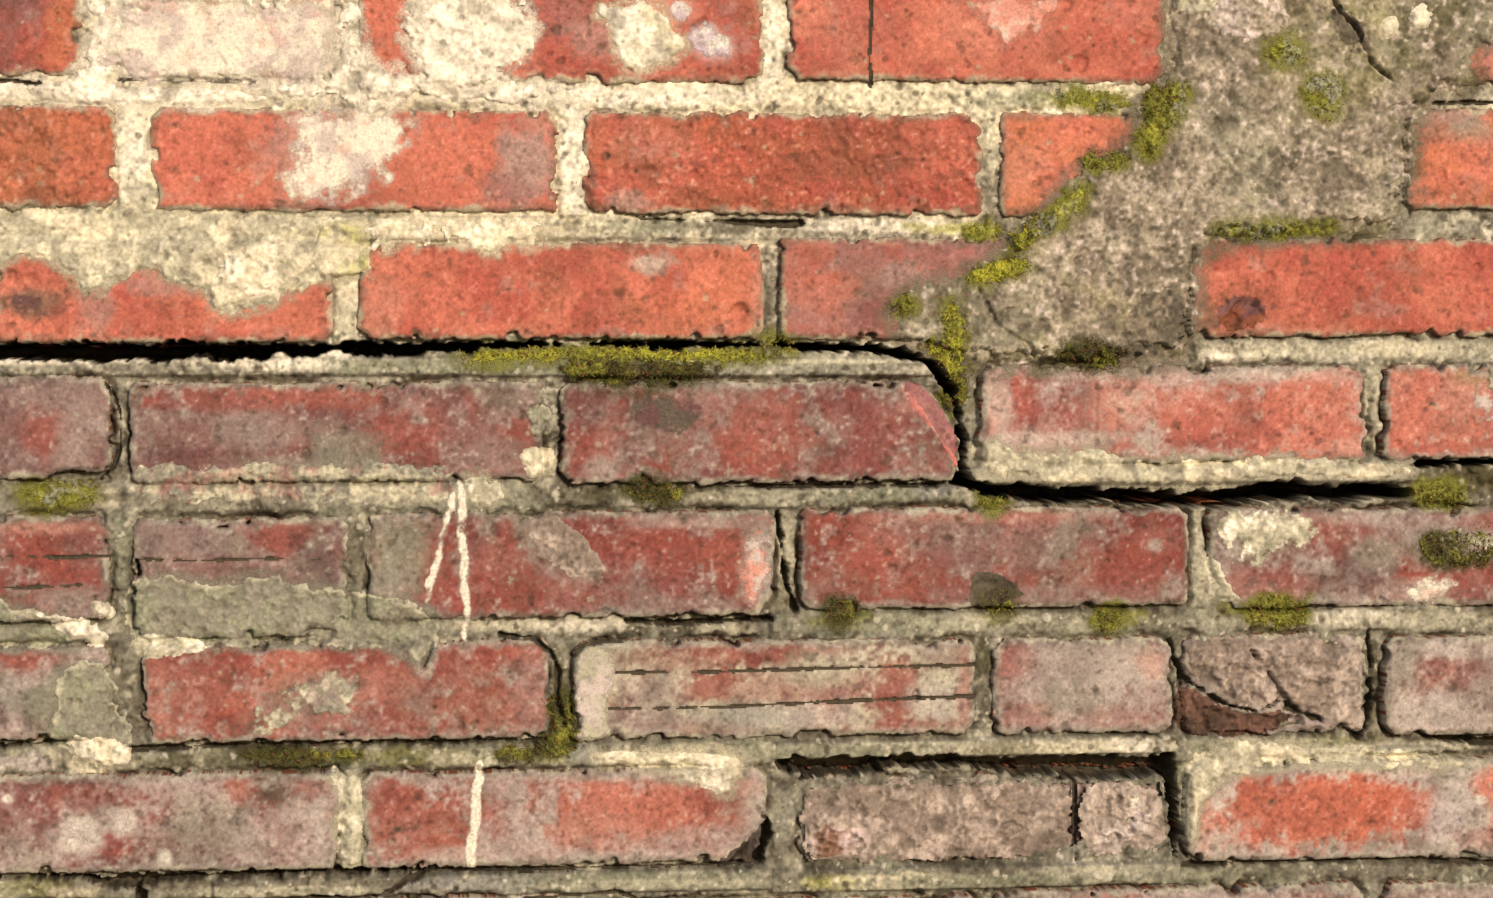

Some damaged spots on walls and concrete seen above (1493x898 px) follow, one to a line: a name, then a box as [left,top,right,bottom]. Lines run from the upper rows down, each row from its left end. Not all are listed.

crack [867,0,875,88]
leakage [281,98,414,206]
crack [0,338,1493,753]
leakage [1407,577,1457,605]
crack [775,752,1493,869]